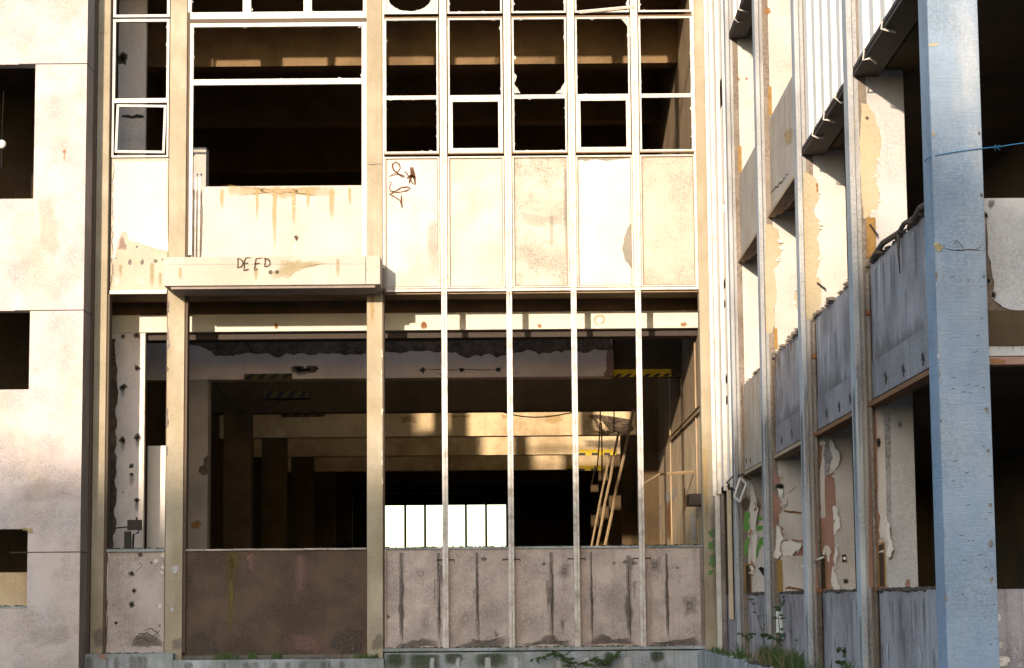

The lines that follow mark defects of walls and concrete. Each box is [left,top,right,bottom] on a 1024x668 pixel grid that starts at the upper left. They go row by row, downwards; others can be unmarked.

peeling [859,102,882,219]
spalling [110,163,163,287]
peeling [765,224,785,334]
peeling [792,171,824,320]
spalling [190,341,367,374]
spalling [381,339,614,381]
peeling [772,439,840,592]
peeling [868,408,894,588]
leakage [399,554,441,648]
leakage [528,552,564,645]
leakage [591,556,631,645]
leakage [656,554,695,645]